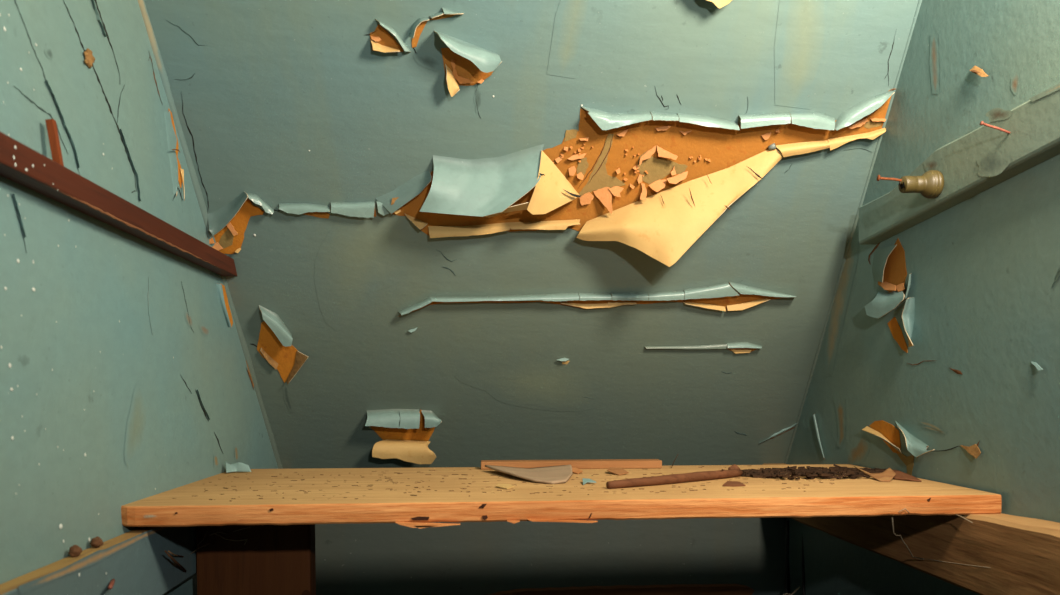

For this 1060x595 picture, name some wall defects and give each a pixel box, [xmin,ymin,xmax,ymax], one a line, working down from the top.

peeling [707,0,732,9]
crack [14,0,80,173]
crack [63,0,141,201]
peeling [366,7,502,97]
peeling [208,88,896,267]
peeling [216,283,233,328]
peeling [251,305,308,413]
peeling [398,282,796,316]
peeling [644,342,762,353]
peeling [864,239,915,352]
peeling [365,409,442,464]
peeling [861,420,981,475]